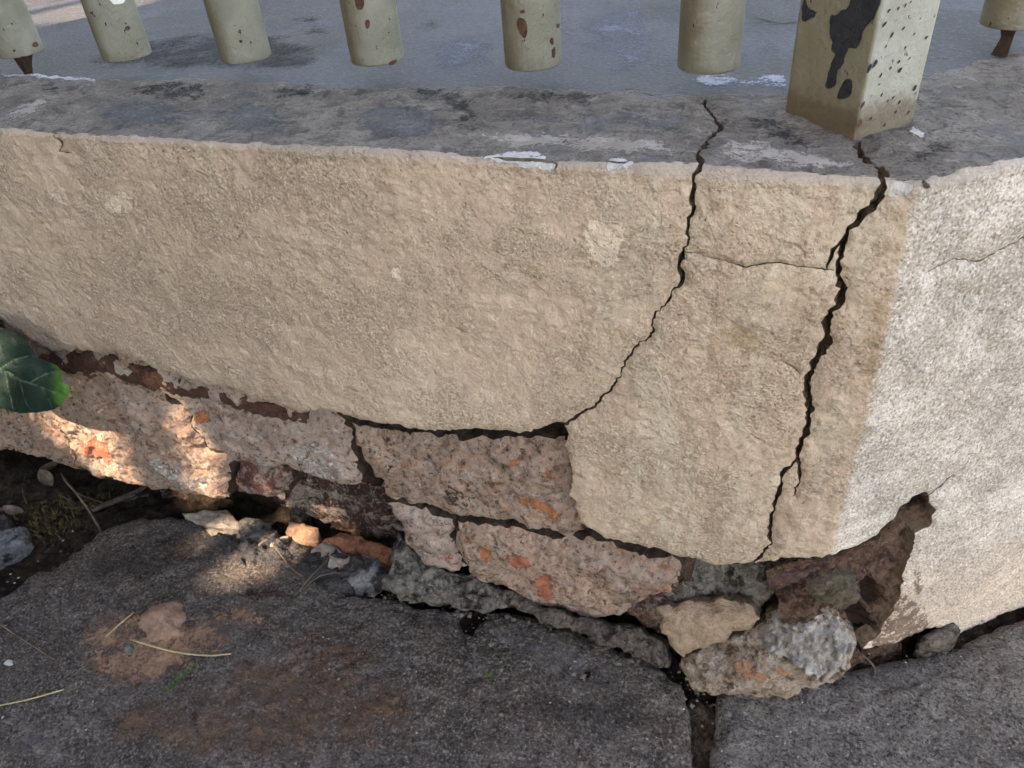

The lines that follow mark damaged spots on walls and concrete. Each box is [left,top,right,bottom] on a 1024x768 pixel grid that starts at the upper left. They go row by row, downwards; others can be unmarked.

crack [561,101,724,425]
spalling [38,350,310,424]
crack [738,143,890,565]
peeling [82,437,114,463]
peeling [517,497,561,522]
peeling [508,555,553,601]
spalling [762,494,927,683]